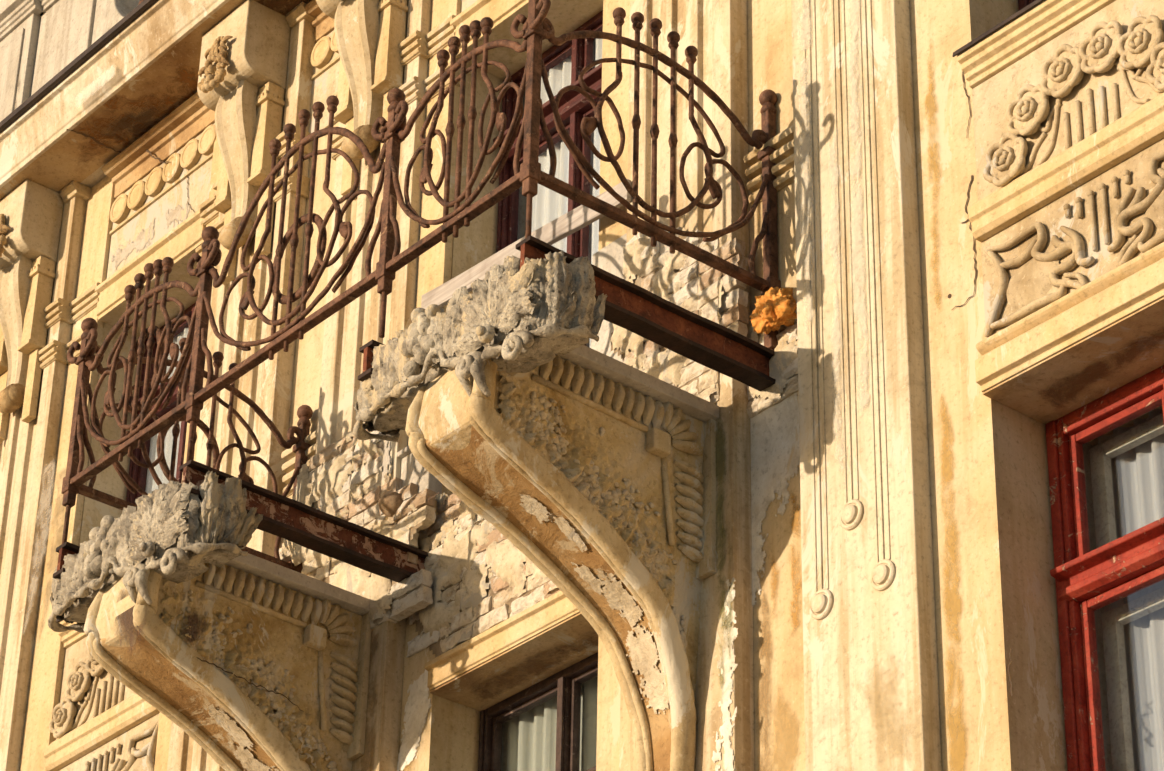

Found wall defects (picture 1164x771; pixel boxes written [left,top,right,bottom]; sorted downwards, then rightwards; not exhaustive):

water stain [77,67,199,161]
water stain [925,74,936,124]
crack [962,71,971,129]
crack [952,175,977,310]
flaking render [610,221,800,607]
water stain [941,403,953,482]
water stain [1044,332,1164,405]
flaking render [279,429,560,658]
peeling [520,494,669,714]
water stain [944,512,961,641]
peeling [397,669,431,771]
peeling [712,577,738,771]